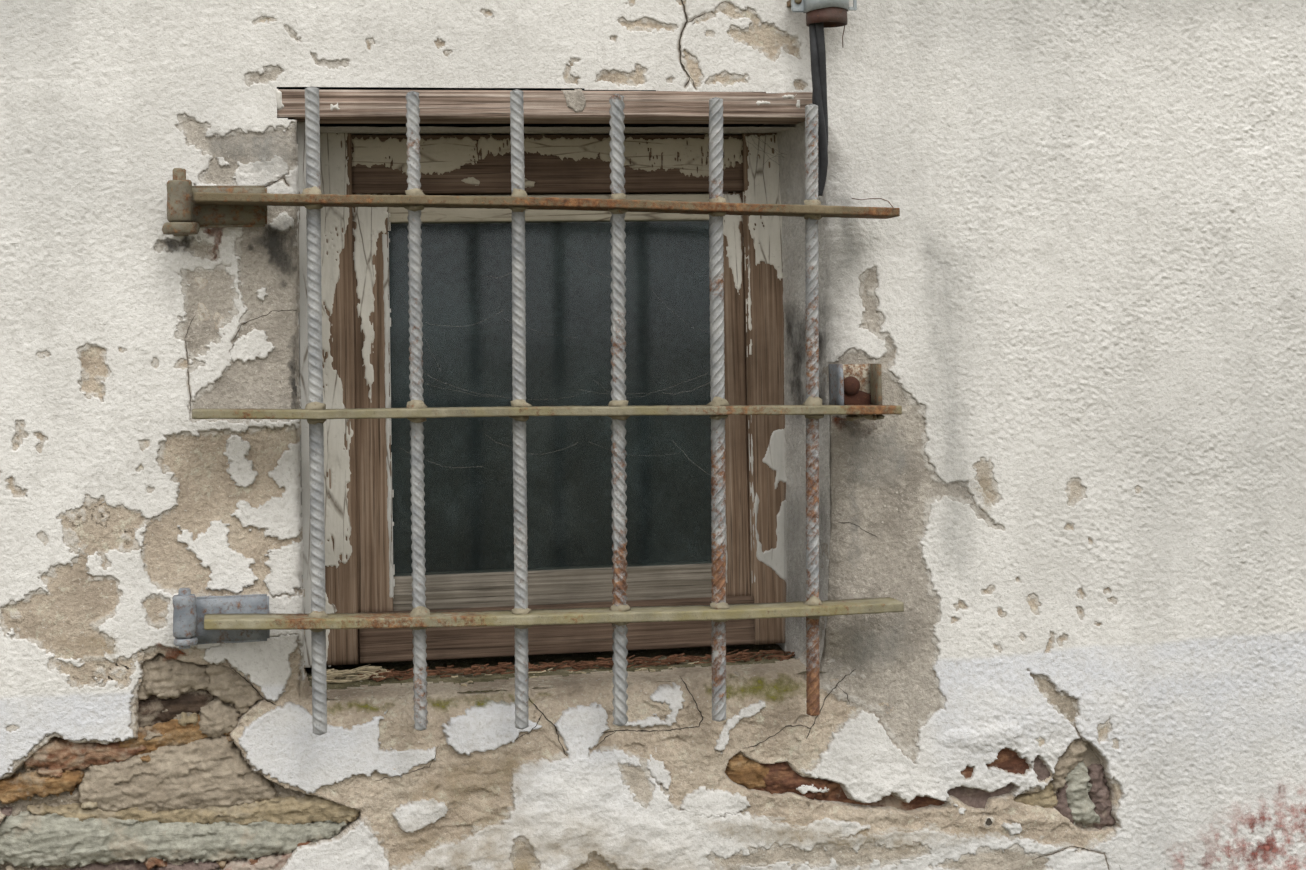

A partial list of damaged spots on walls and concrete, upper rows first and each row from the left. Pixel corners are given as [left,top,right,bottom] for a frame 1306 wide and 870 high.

peeling [563,58,579,89]
peeling [596,65,647,86]
peeling [610,0,677,42]
crack [679,0,705,89]
peeling [666,50,749,87]
peeling [677,0,801,62]
peeling [176,114,298,186]
flaking render [0,133,1122,870]
crack [516,678,703,756]
crack [748,669,856,748]